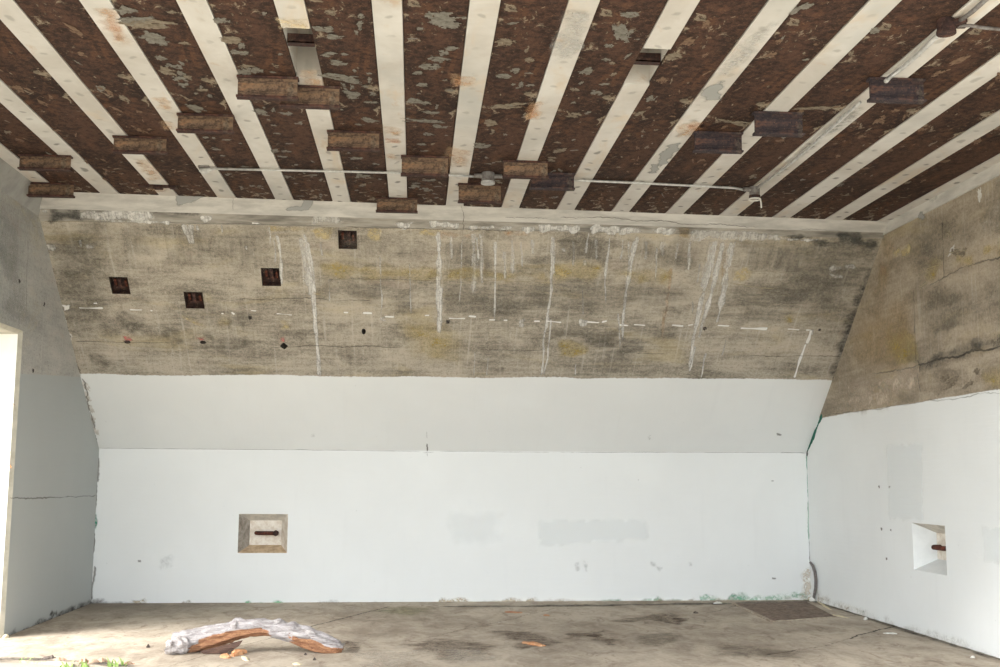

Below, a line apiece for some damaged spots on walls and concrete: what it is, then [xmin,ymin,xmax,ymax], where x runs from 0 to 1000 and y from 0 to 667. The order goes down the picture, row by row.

peeling [317,52,378,104]
peeling [404,46,458,152]
peeling [407,11,467,40]
peeling [494,38,535,89]
peeling [566,12,640,118]
water stain [299,230,329,376]
water stain [417,230,534,347]
water stain [519,234,666,375]
water stain [672,241,768,377]
water stain [797,232,876,293]
crack [15,368,99,505]
crack [705,223,1000,559]